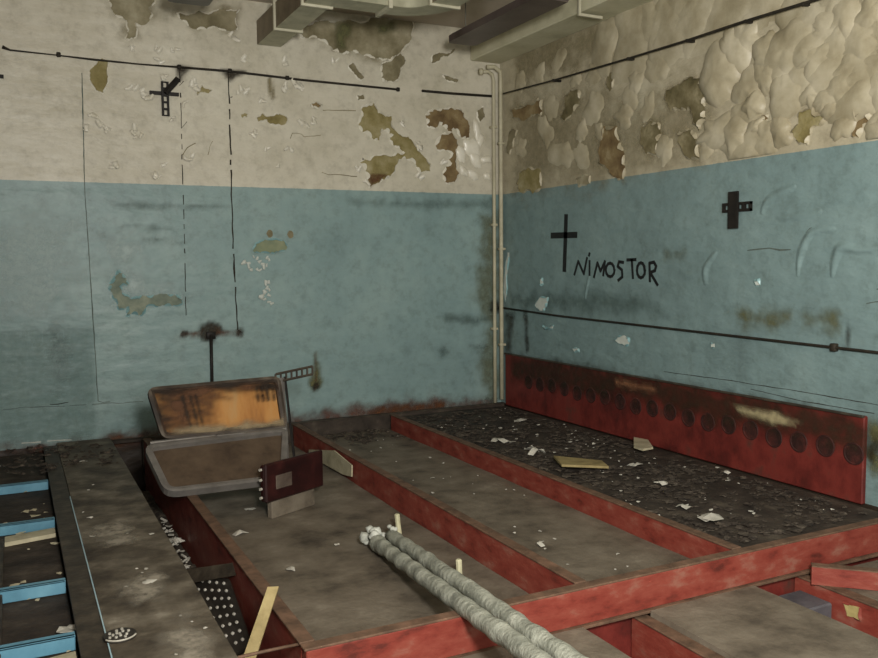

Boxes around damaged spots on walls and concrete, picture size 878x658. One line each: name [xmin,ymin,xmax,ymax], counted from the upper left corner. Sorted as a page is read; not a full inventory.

peeling [108,0,155,51]
peeling [177,7,241,42]
peeling [299,18,414,83]
peeling [355,94,485,188]
peeling [108,270,183,318]
peeling [241,230,293,305]